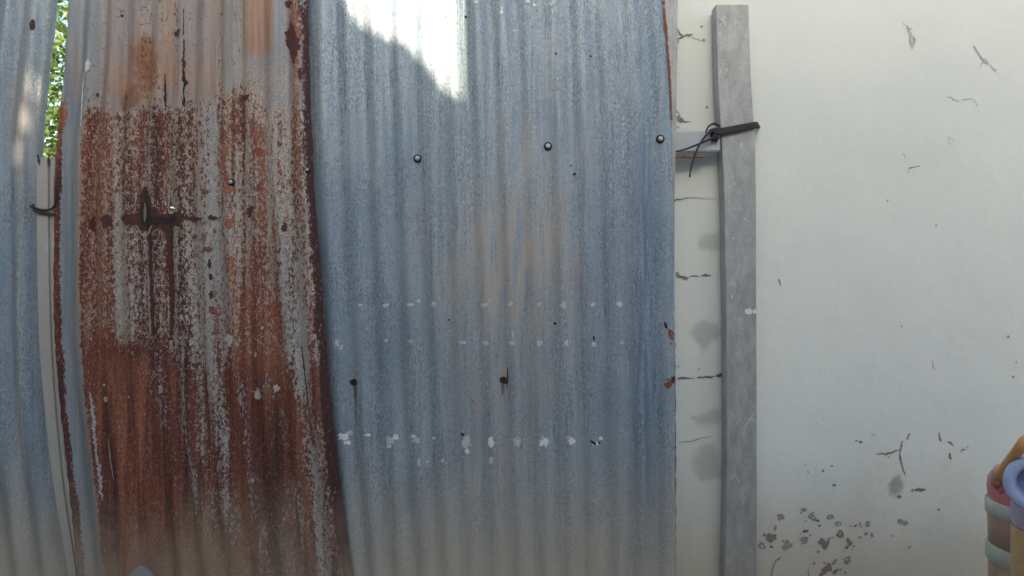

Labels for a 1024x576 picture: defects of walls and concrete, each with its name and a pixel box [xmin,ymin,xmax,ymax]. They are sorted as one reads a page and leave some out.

rust [662,1,672,120]
crack [677,25,706,57]
rust [147,229,155,336]
rust [165,228,175,340]
rust [203,246,215,315]
crack [676,272,711,280]
crack [678,365,722,380]
crack [871,433,910,474]
peeling [757,508,874,576]